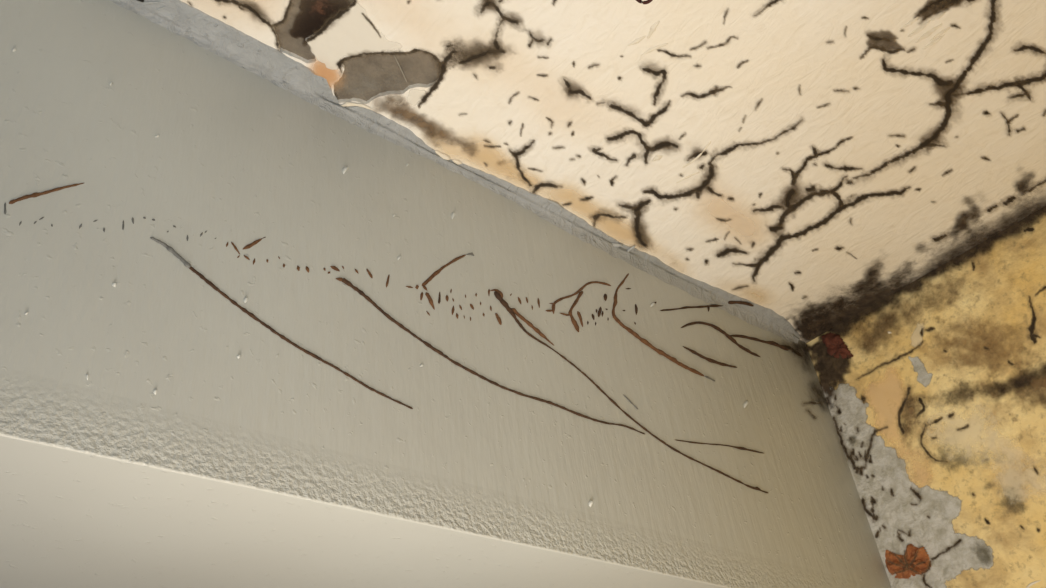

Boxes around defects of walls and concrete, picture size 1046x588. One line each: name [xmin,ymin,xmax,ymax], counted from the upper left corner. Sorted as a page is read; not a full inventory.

crack [188,0,279,48]
spalling [271,0,442,110]
water stain [381,97,501,169]
crack [418,0,1046,299]
water stain [560,192,639,242]
water stain [782,175,1046,419]
peeling [821,369,994,588]
water stain [898,387,948,462]